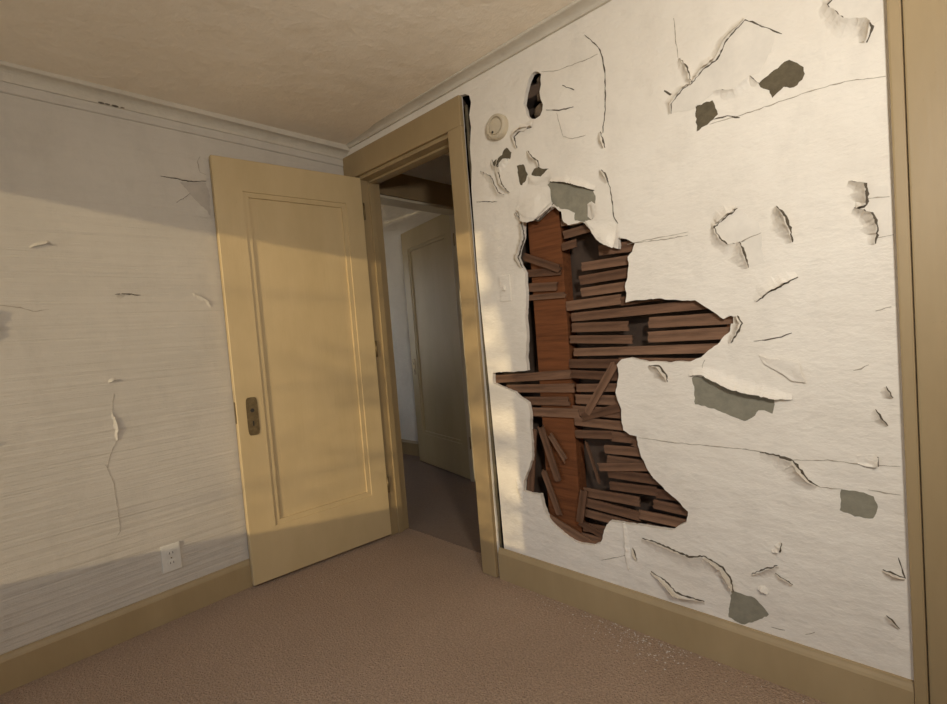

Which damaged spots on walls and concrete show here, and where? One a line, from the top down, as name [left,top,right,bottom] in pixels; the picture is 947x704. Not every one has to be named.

peeling [818,0,883,43]
crack [709,76,886,125]
crack [563,35,618,223]
crack [627,232,688,245]
spalling [480,54,798,624]